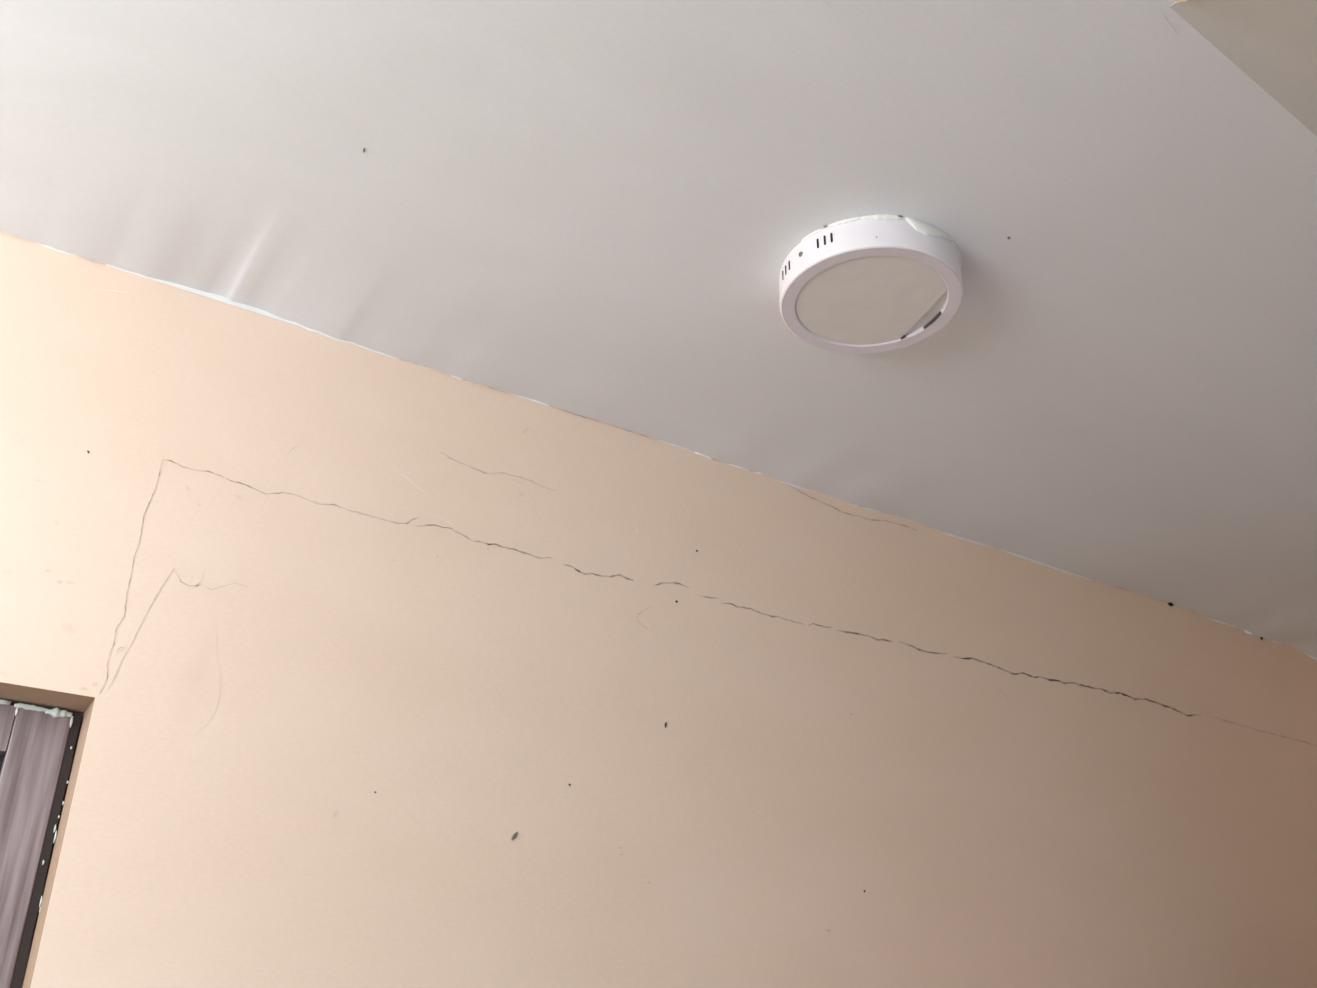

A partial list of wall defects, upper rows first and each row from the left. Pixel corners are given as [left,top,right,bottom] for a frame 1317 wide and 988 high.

crack [550,406,658,441]
crack [441,452,557,491]
crack [99,459,1317,746]